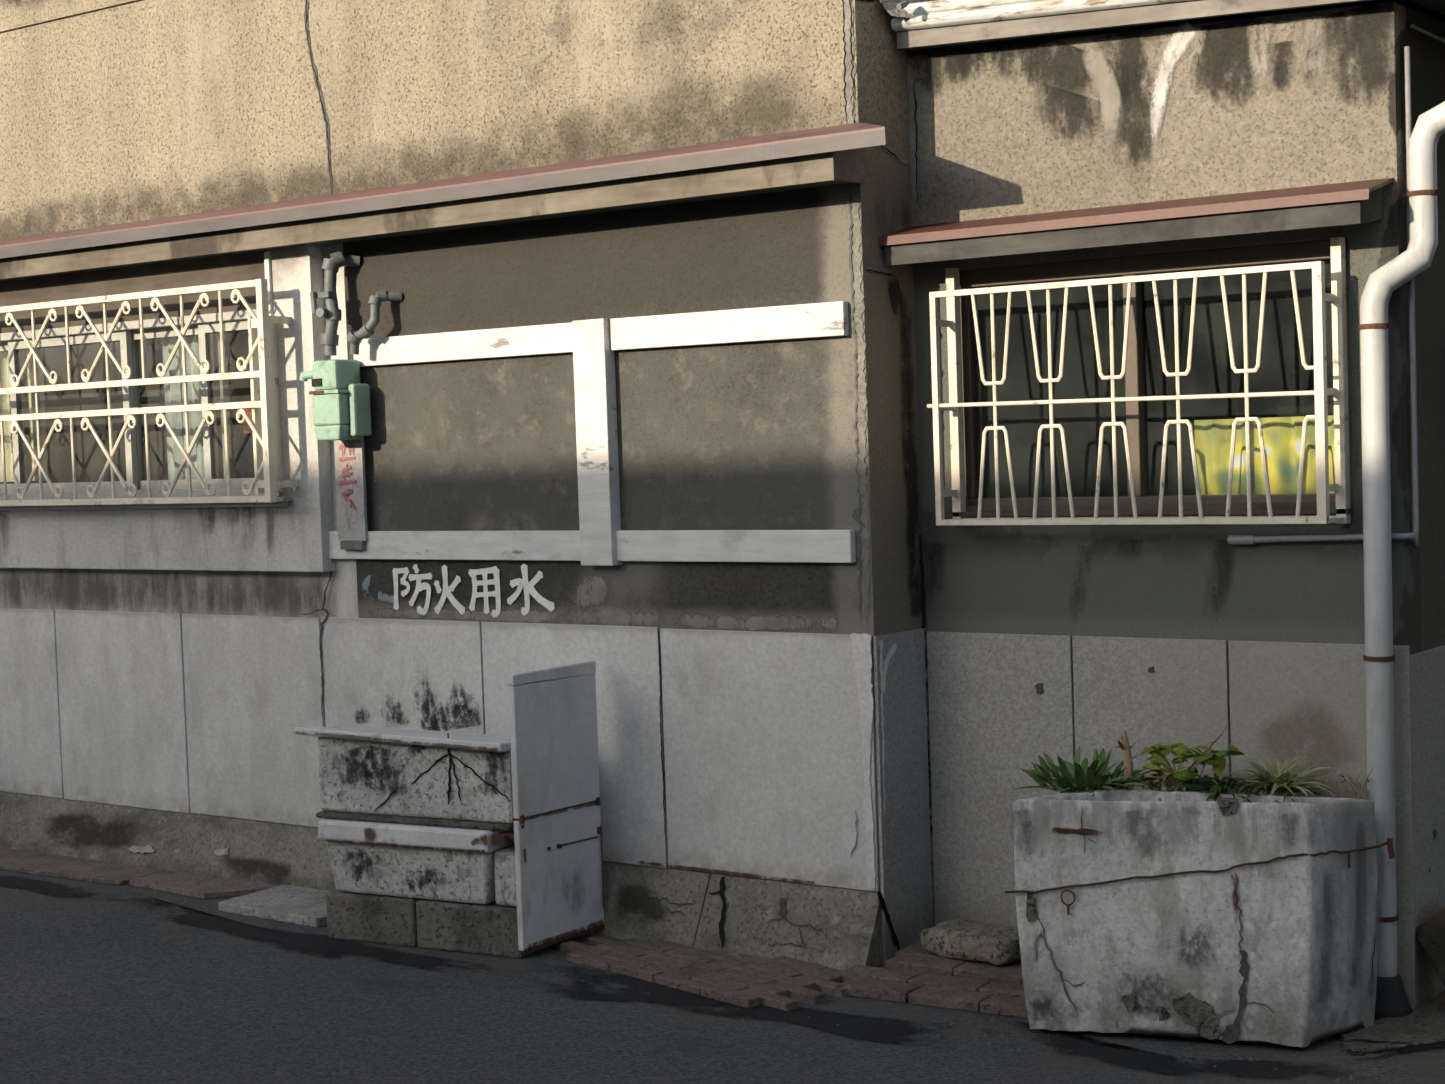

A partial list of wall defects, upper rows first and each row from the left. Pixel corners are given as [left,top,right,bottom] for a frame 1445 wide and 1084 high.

crack [304,0,332,195]
damp [917,1,1394,166]
crack [303,559,333,723]
damp [334,682,480,794]
damp [485,751,506,794]
crack [644,877,727,948]
crack [767,917,826,950]